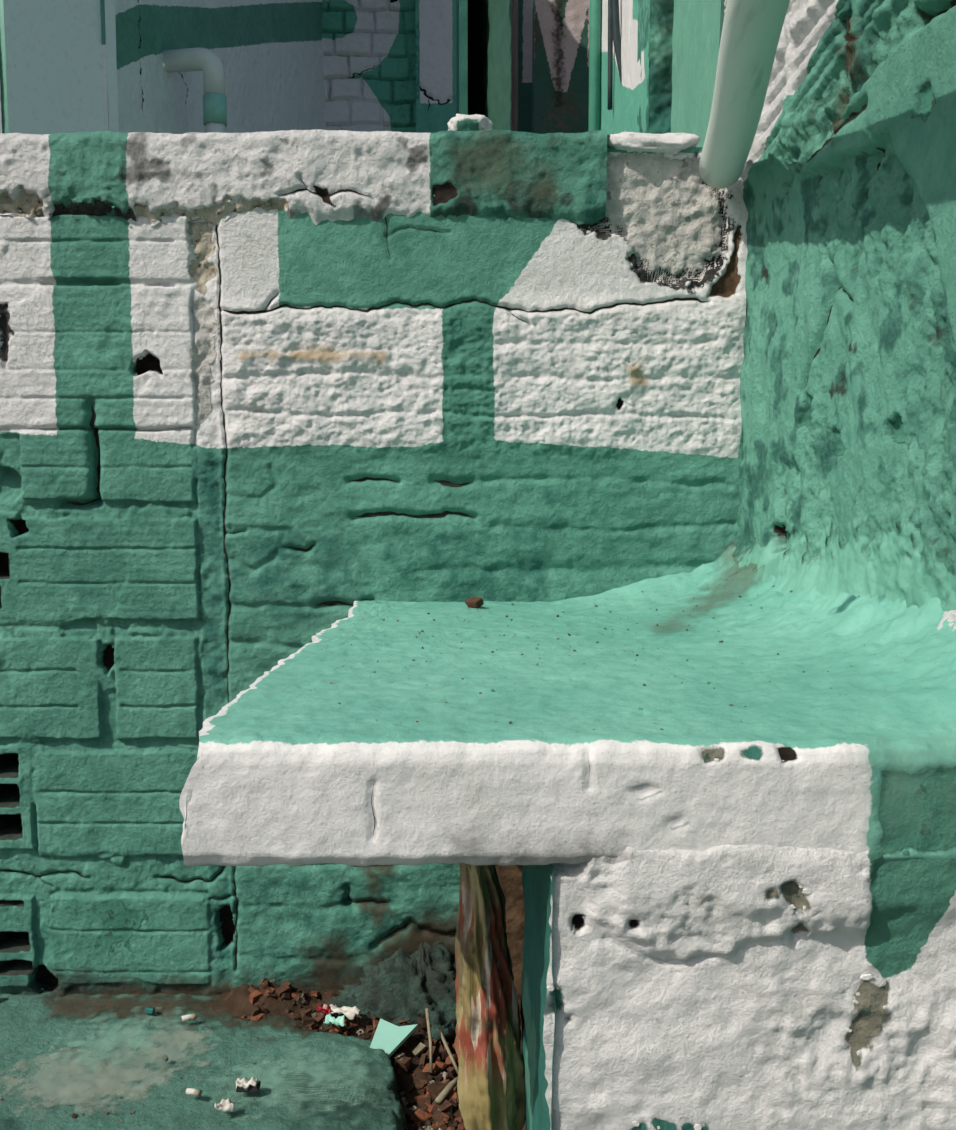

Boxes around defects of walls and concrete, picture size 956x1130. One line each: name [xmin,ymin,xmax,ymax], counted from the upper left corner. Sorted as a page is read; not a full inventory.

crack [283,178,440,256]
spalling [591,152,743,297]
spalling [0,185,289,425]
crack [69,404,102,506]
crack [215,225,708,703]
crack [158,866,238,967]
damp [288,915,457,1000]